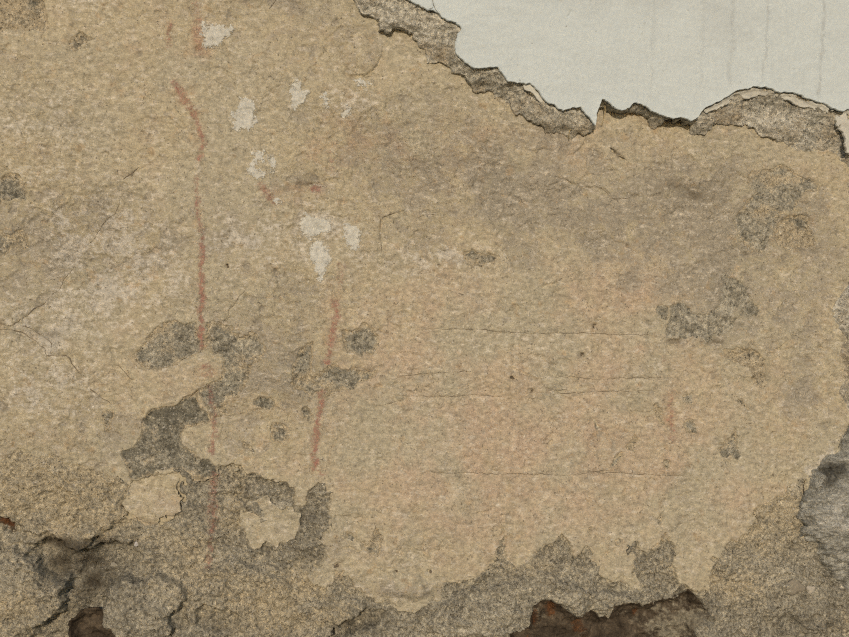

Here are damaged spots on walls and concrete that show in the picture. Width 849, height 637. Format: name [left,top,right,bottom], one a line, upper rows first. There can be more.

spalling [0,0,50,38]
spalling [69,33,93,52]
spalling [353,0,596,139]
spalling [599,87,849,167]
spalling [0,173,27,204]
peeling [308,239,332,283]
peeling [342,223,362,251]
spalling [463,250,499,270]
spalling [733,165,819,254]
spalling [656,272,760,343]
spalling [832,282,849,411]
spalling [0,320,849,637]